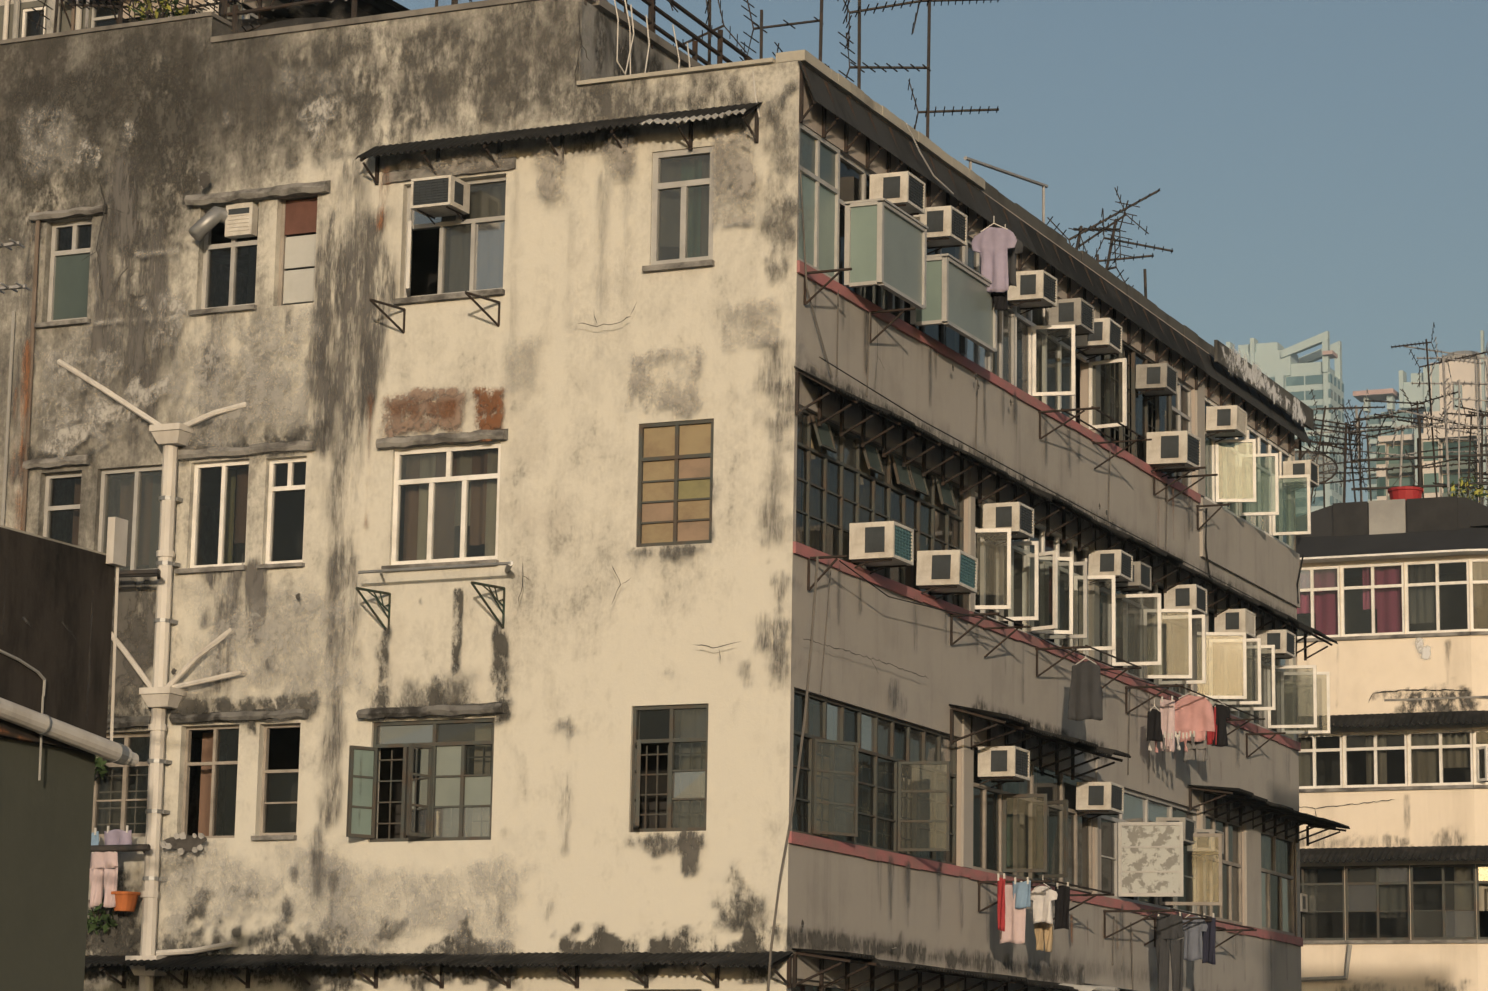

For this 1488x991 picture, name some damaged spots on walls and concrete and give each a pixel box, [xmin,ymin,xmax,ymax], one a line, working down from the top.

leakage [394,0,748,152]
leakage [767,83,796,170]
leakage [3,1,384,441]
leakage [767,201,799,277]
leakage [286,147,395,492]
leakage [108,577,157,714]
leakage [327,511,357,665]
leakage [761,625,788,678]
leakage [291,698,342,894]
leakage [648,830,699,875]
leakage [310,917,522,991]